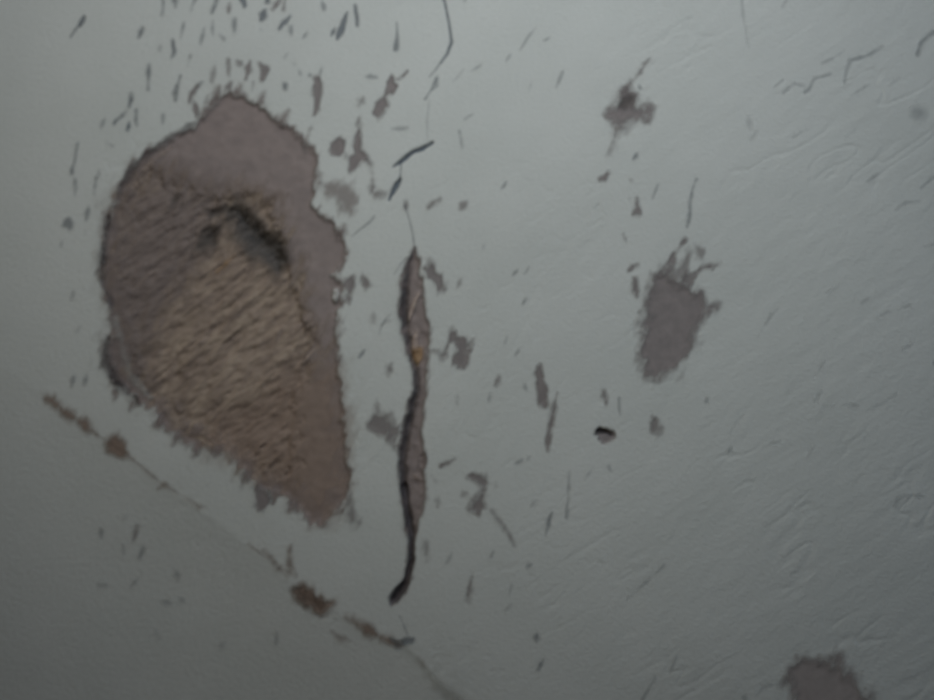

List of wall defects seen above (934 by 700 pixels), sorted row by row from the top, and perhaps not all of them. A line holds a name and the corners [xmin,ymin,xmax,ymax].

peeling [245,62,269,81]
crack [433,0,452,86]
flaking render [101,77,369,527]
peeling [442,332,472,369]
peeling [628,239,718,378]
crack [390,247,430,604]
peeling [595,428,616,443]
peeling [787,654,867,700]